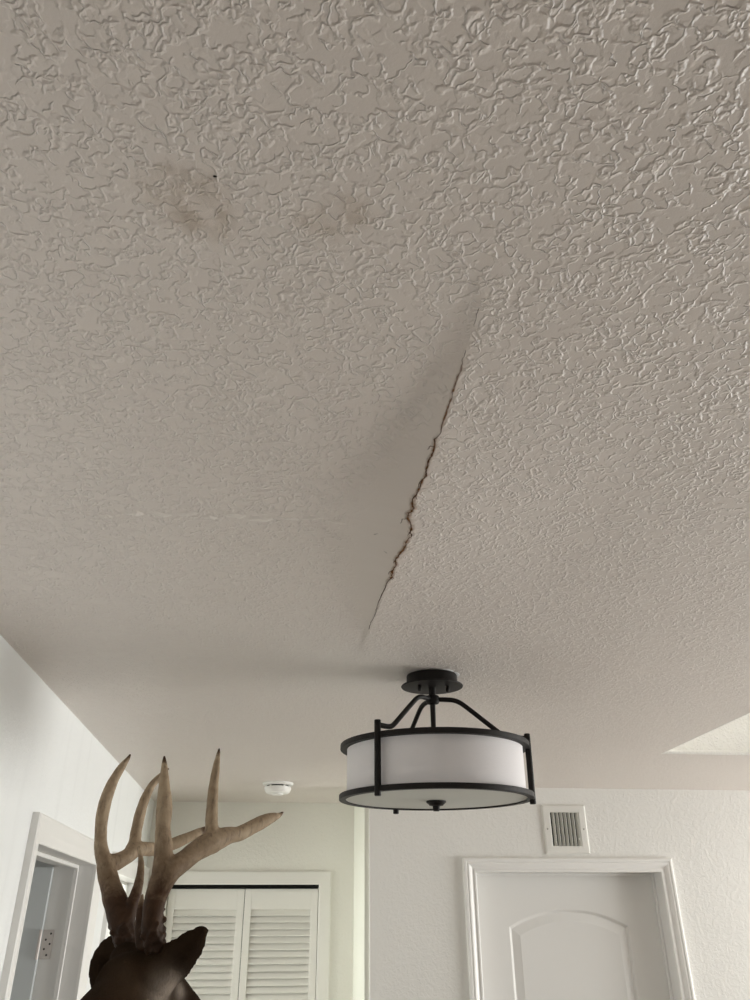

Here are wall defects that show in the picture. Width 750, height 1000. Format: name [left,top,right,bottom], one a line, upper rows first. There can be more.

crack [369,350,466,628]